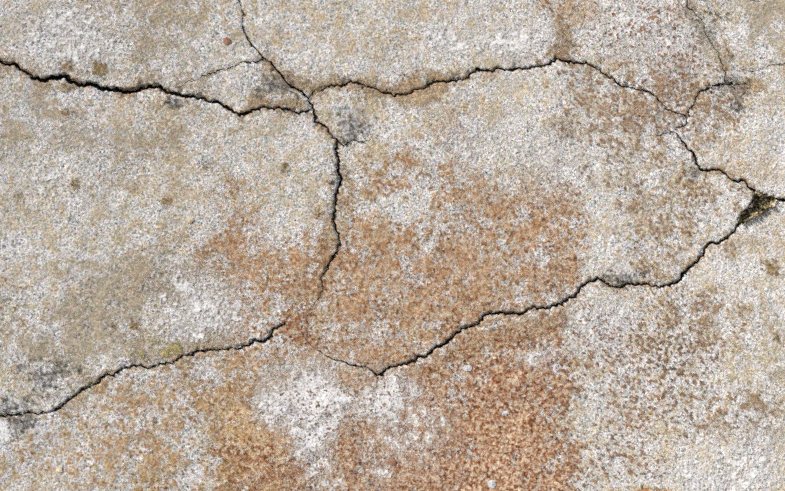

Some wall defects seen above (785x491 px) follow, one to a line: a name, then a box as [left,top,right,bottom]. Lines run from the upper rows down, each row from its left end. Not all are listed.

rust [526,0,751,168]
crack [0,0,785,385]
rust [364,152,430,197]
crack [0,322,286,417]
rust [63,163,783,491]